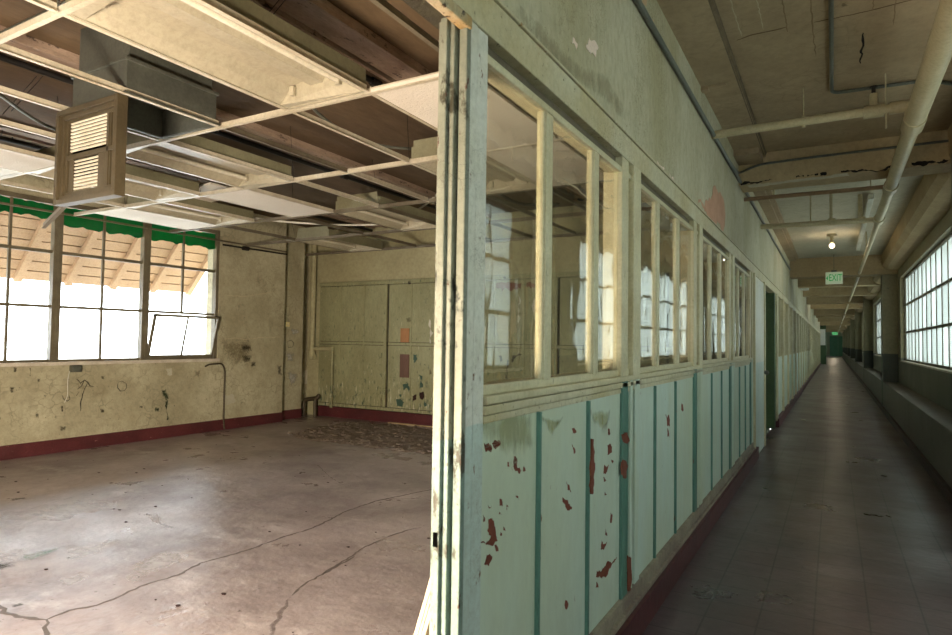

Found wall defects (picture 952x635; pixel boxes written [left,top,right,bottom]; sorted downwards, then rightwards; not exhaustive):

peeling [572,37,599,57]
crack [730,0,788,40]
crack [810,0,911,63]
peeling [741,165,891,188]
spalling [912,159,948,167]
peeling [496,276,535,323]
peeling [396,375,427,407]
peeling [589,428,630,495]
peeling [481,499,508,566]
crack [0,489,432,635]
peeling [596,555,632,591]